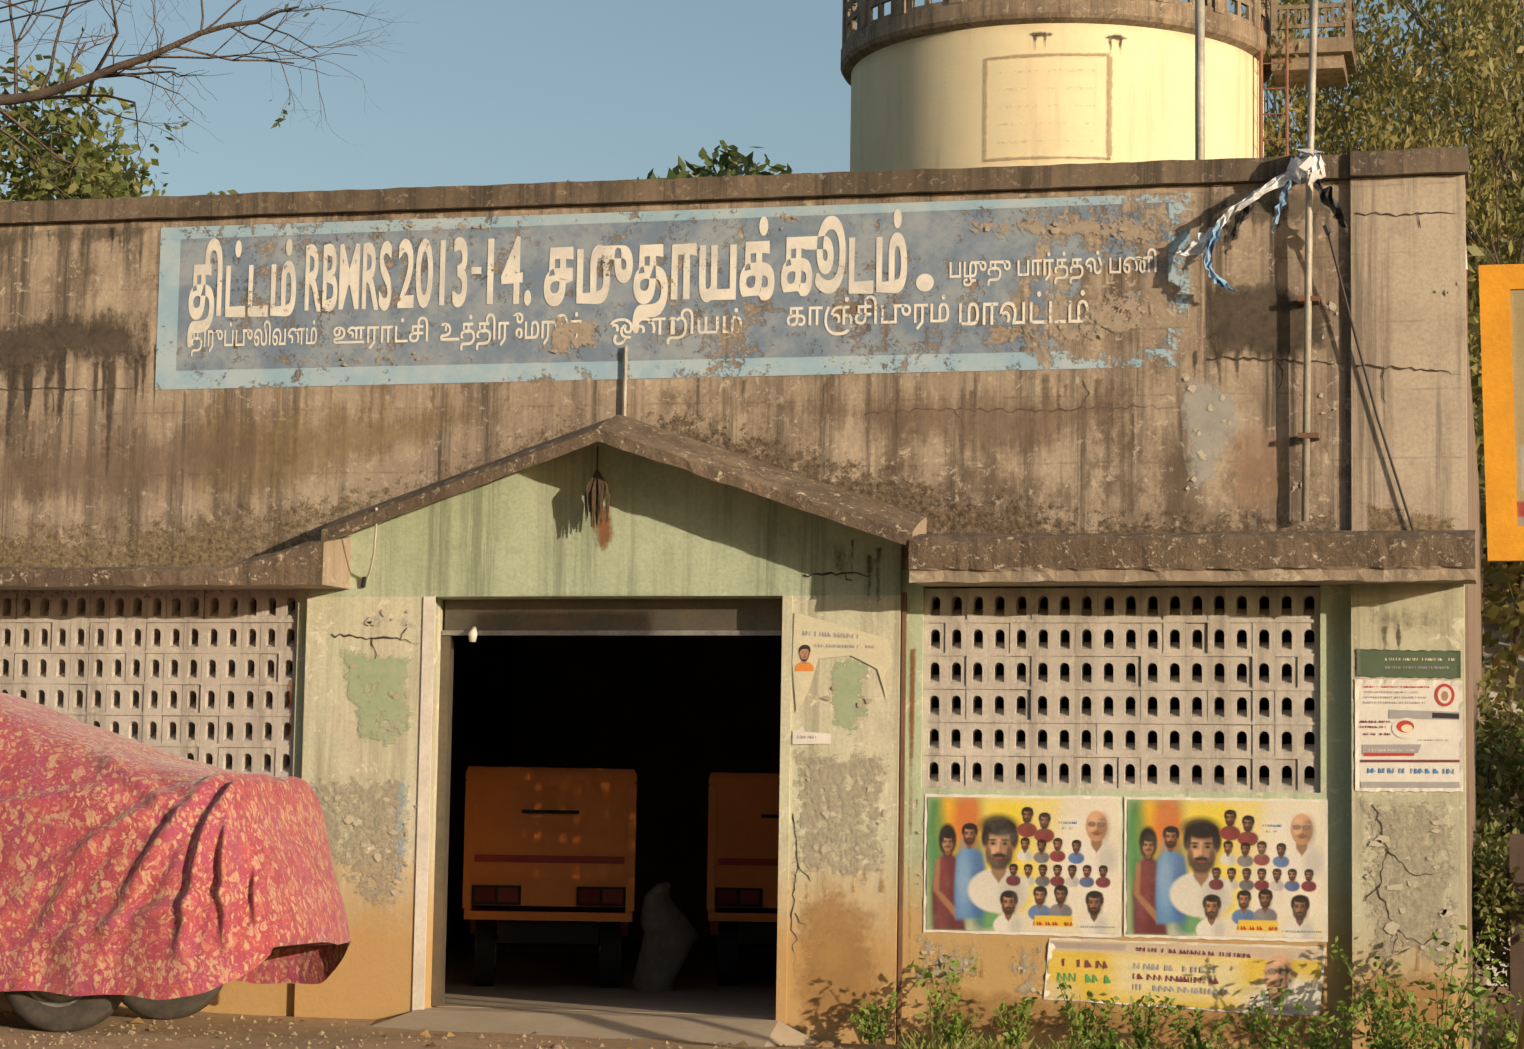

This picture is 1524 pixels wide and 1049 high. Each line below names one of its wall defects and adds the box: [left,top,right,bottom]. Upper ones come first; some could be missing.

peeling [956,214,1158,249]
damp [0,308,256,501]
peeling [1002,288,1155,347]
damp [1193,284,1324,403]
peeling [342,649,412,750]
peeling [794,656,889,884]
peeling [311,775,418,918]
crack [1364,804,1445,967]